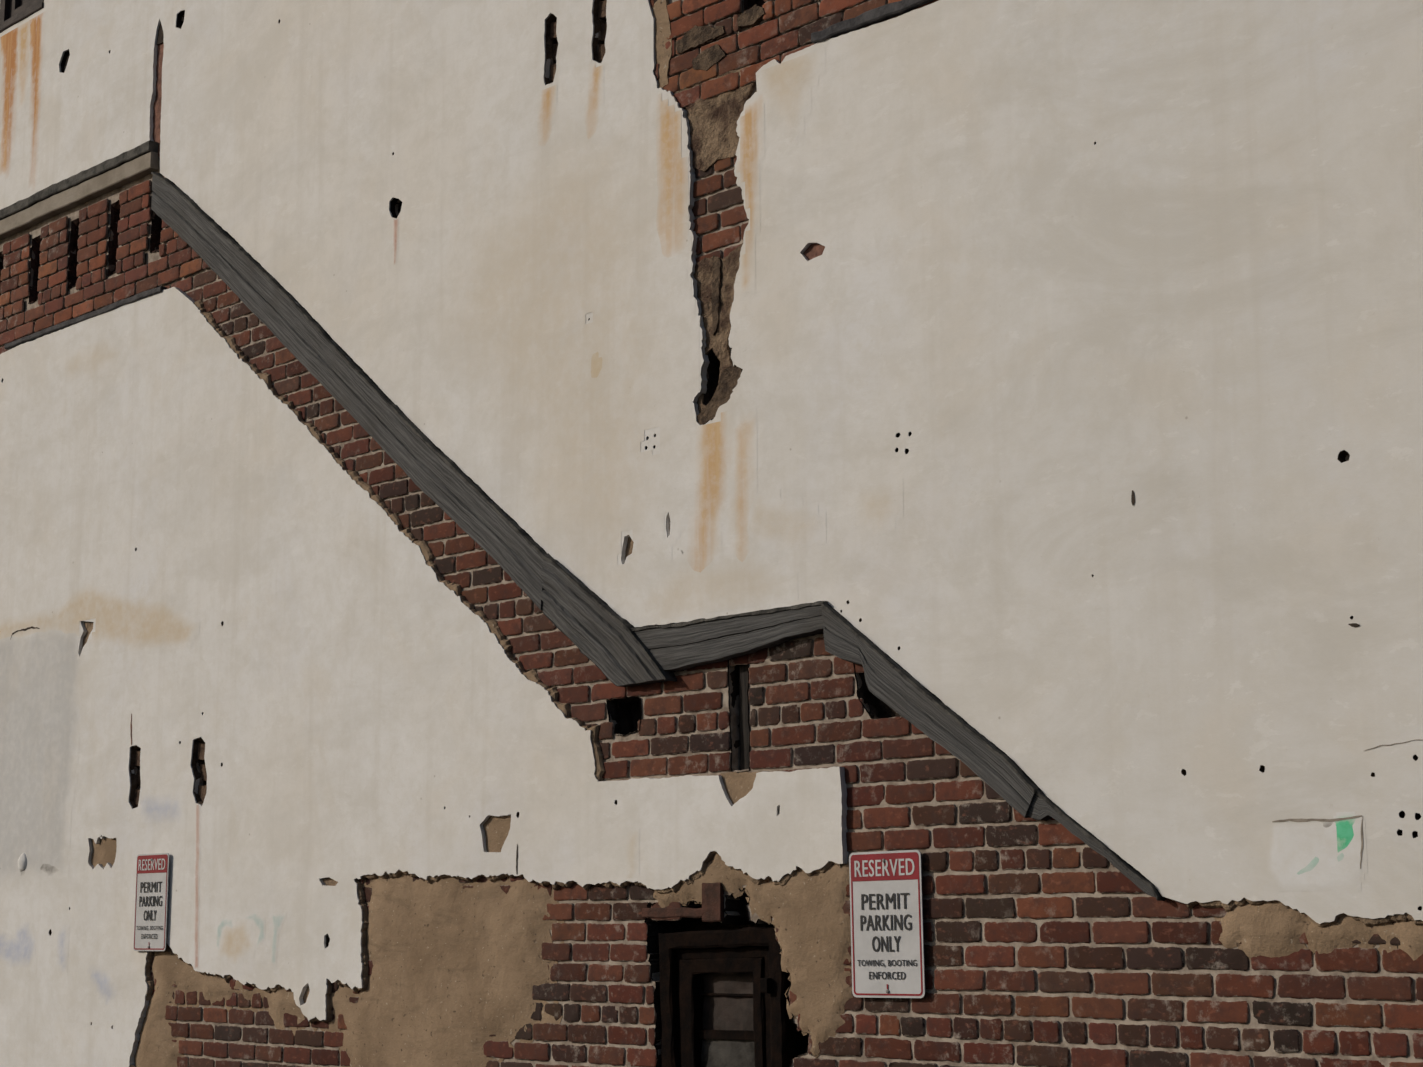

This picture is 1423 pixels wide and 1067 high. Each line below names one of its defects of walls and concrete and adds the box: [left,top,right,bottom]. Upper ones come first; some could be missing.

rust [0,11,46,193]
flaking render [652,0,765,425]
flaking render [803,244,825,260]
rust [680,401,758,573]
flaking render [720,771,761,805]
flaking render [91,837,117,867]
flaking render [483,815,511,852]
flaking render [130,851,863,1067]
flaking render [1186,898,1423,961]